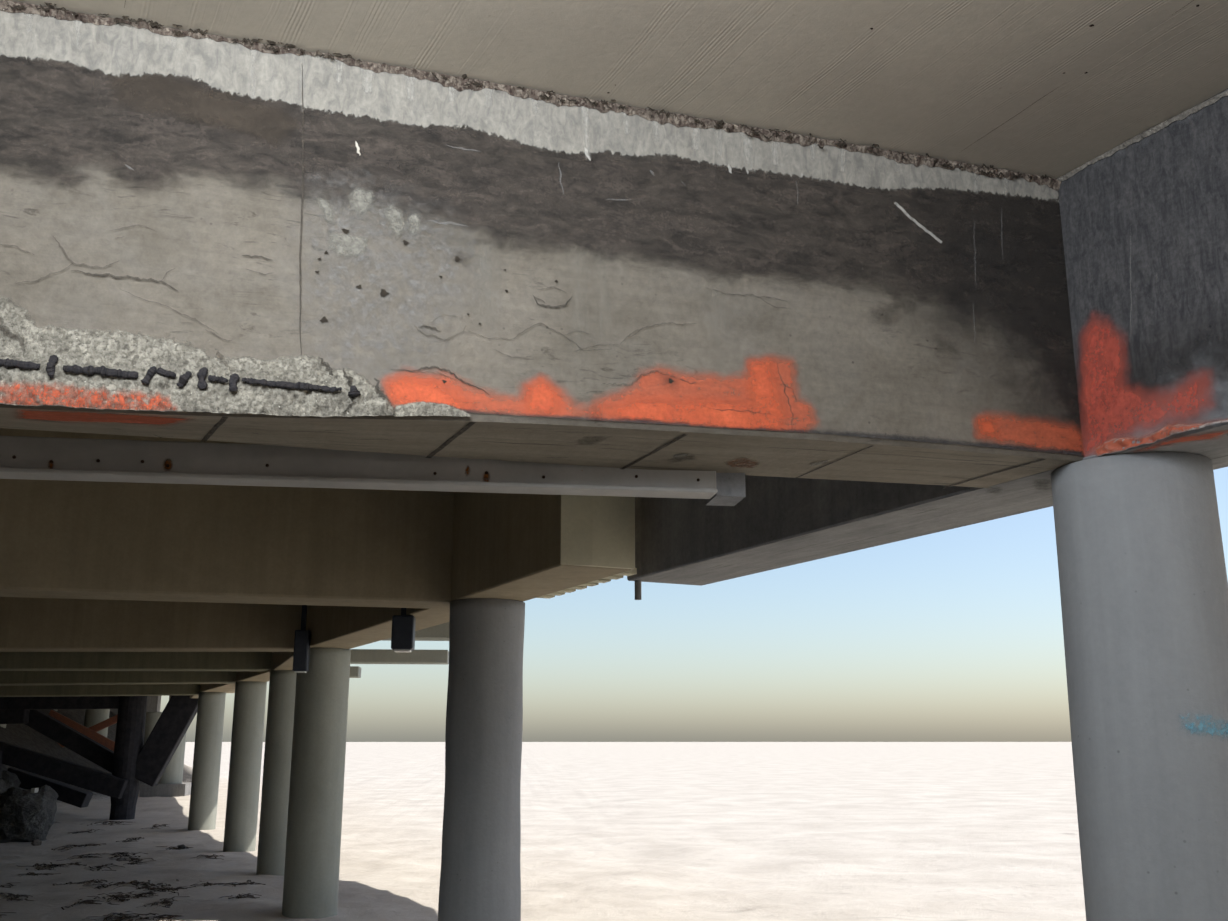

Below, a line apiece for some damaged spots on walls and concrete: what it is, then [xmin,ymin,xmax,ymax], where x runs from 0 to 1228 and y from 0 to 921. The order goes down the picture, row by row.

peeling [315,199,367,273]
peeling [350,189,372,213]
peeling [386,206,419,245]
damp [0,10,1228,456]
crack [3,244,231,341]
spalling [0,297,471,417]
crack [391,287,687,395]